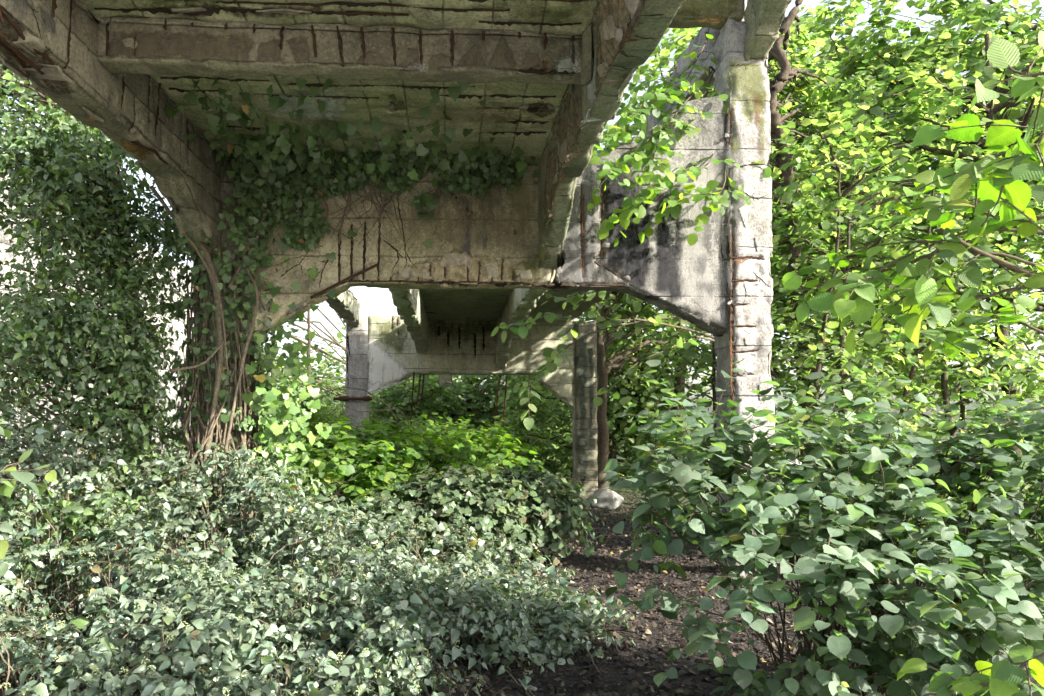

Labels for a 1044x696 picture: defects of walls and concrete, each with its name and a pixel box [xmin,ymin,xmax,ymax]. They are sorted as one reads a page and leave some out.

spalling [0,0,76,94]
peeling [94,0,582,225]
spalling [532,0,645,93]
corrosion [754,94,762,123]
leakage [566,120,744,322]
corrosion [730,234,750,398]